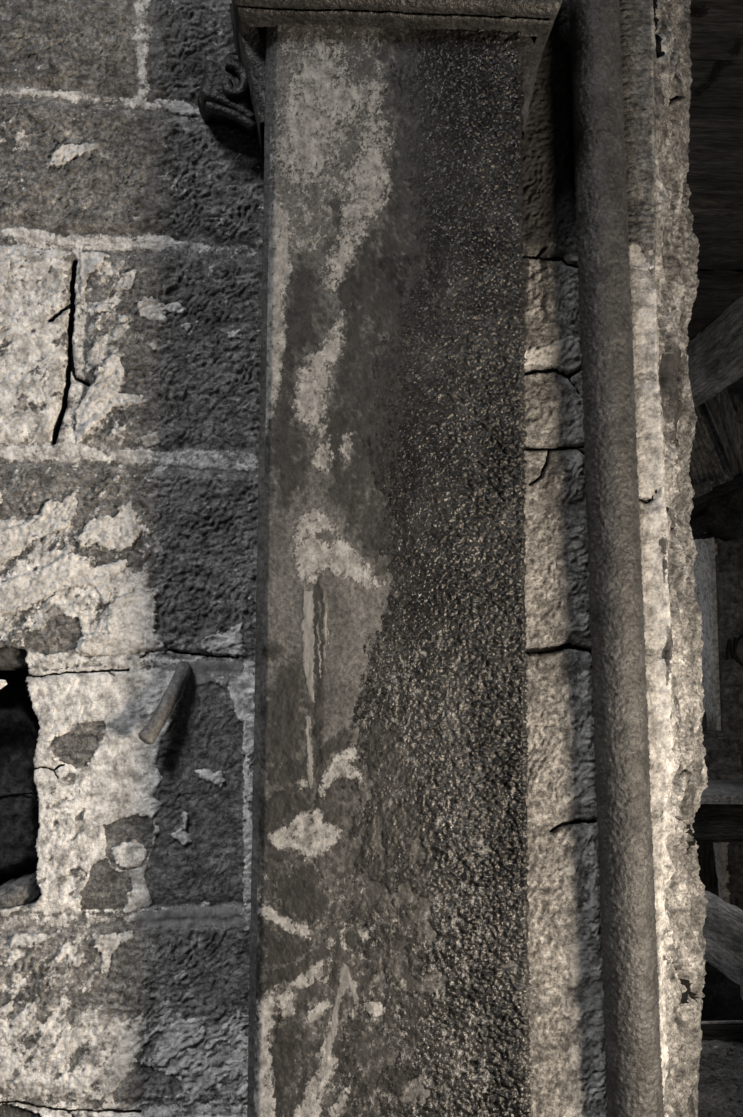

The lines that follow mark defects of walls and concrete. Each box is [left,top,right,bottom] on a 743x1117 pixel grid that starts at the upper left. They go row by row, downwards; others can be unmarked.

crack [48,260,91,445]
damp [265,249,364,516]
crack [28,649,239,678]
damp [259,571,354,834]
crack [549,818,597,832]
damp [275,865,326,923]
damp [255,927,312,1001]
damp [270,1017,301,1117]
crack [0,1100,142,1117]